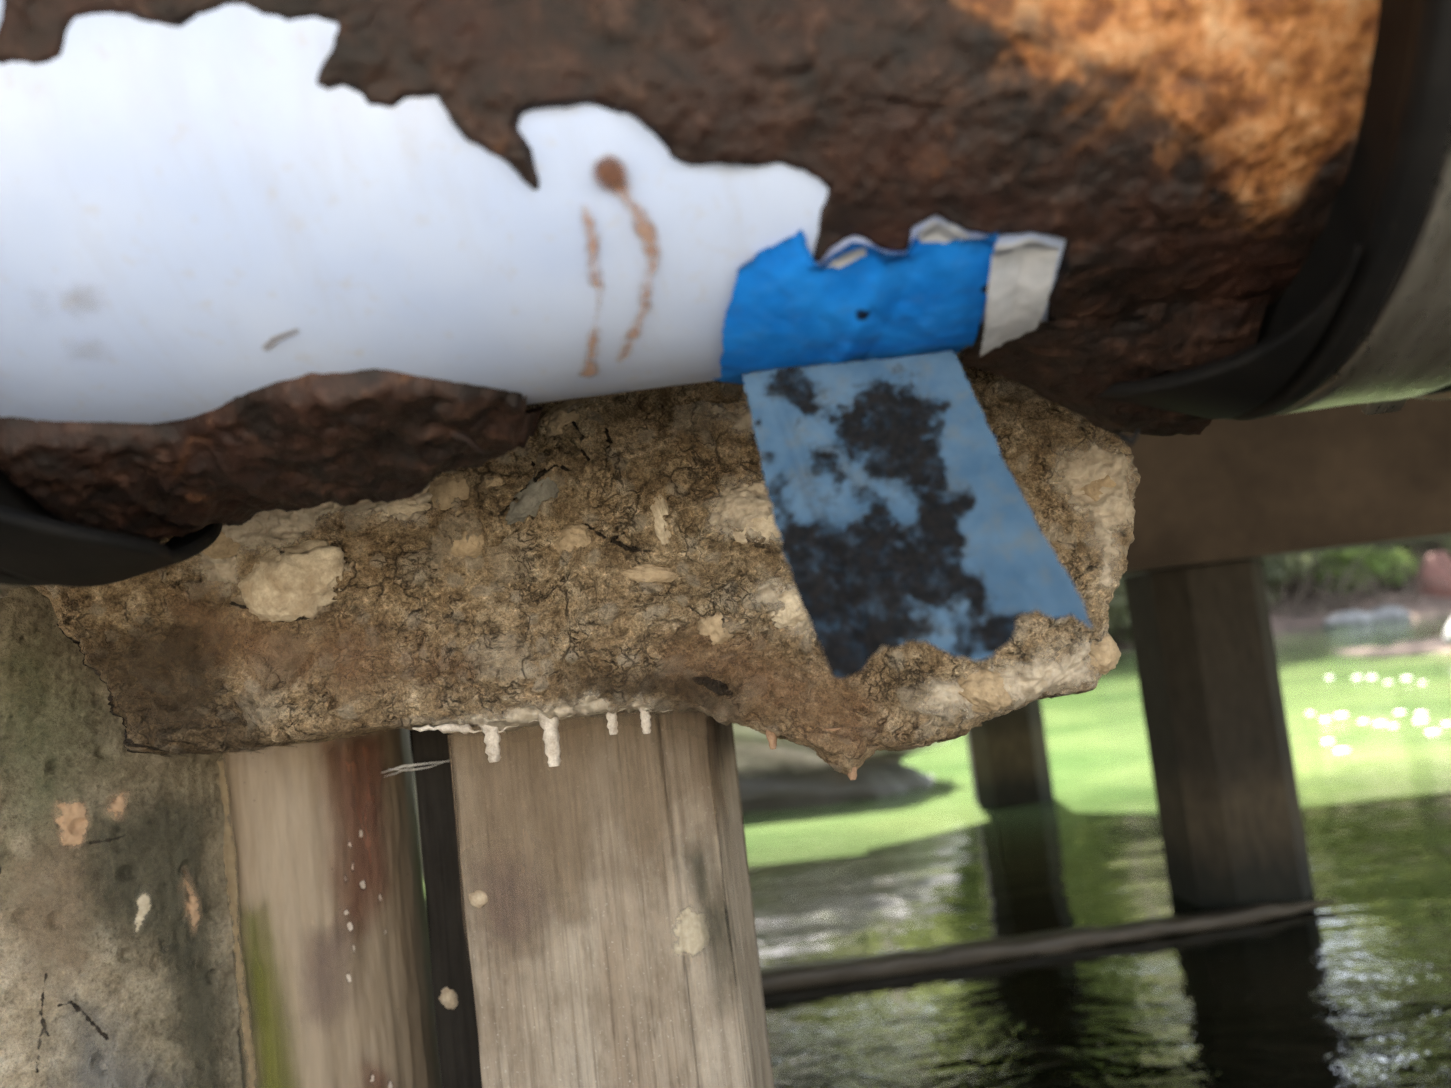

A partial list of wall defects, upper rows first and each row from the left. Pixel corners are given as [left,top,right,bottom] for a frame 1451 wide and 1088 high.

corrosion [580,329,598,377]
corrosion [594,158,658,358]
corrosion [0,0,1380,322]
damp [412,674,723,934]